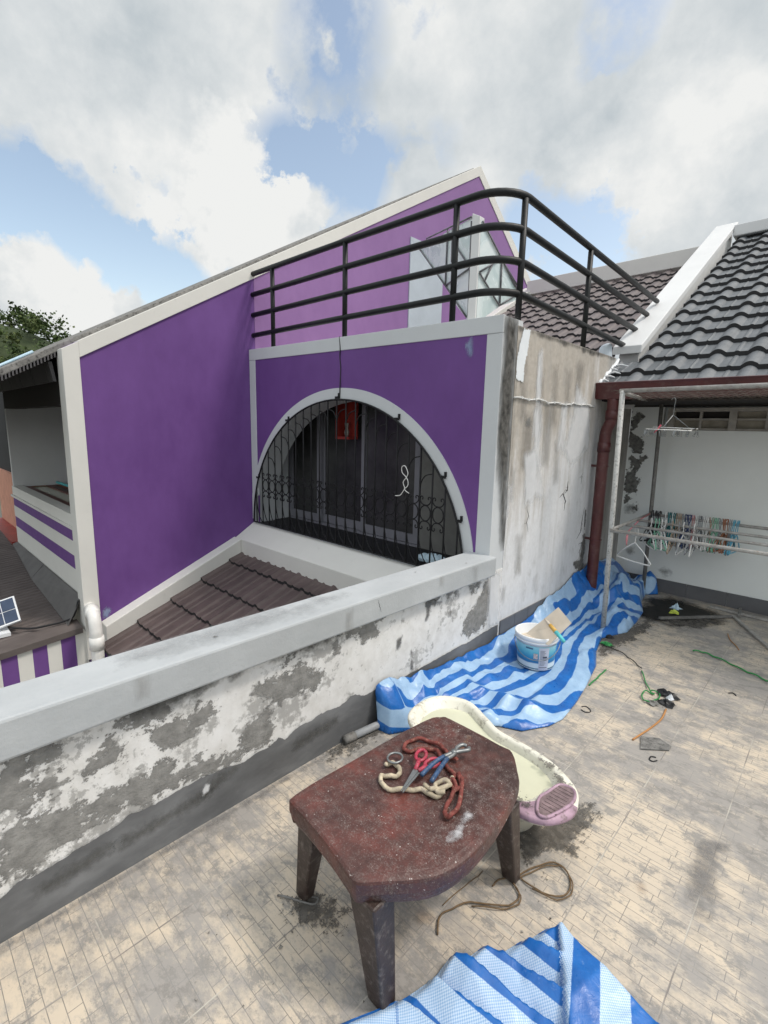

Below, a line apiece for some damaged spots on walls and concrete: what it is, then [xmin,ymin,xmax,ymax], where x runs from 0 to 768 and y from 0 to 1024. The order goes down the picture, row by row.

damp [498,315,526,547]
damp [525,353,543,503]
peeling [332,617,386,656]
peeling [424,578,491,640]
peeling [0,651,327,887]